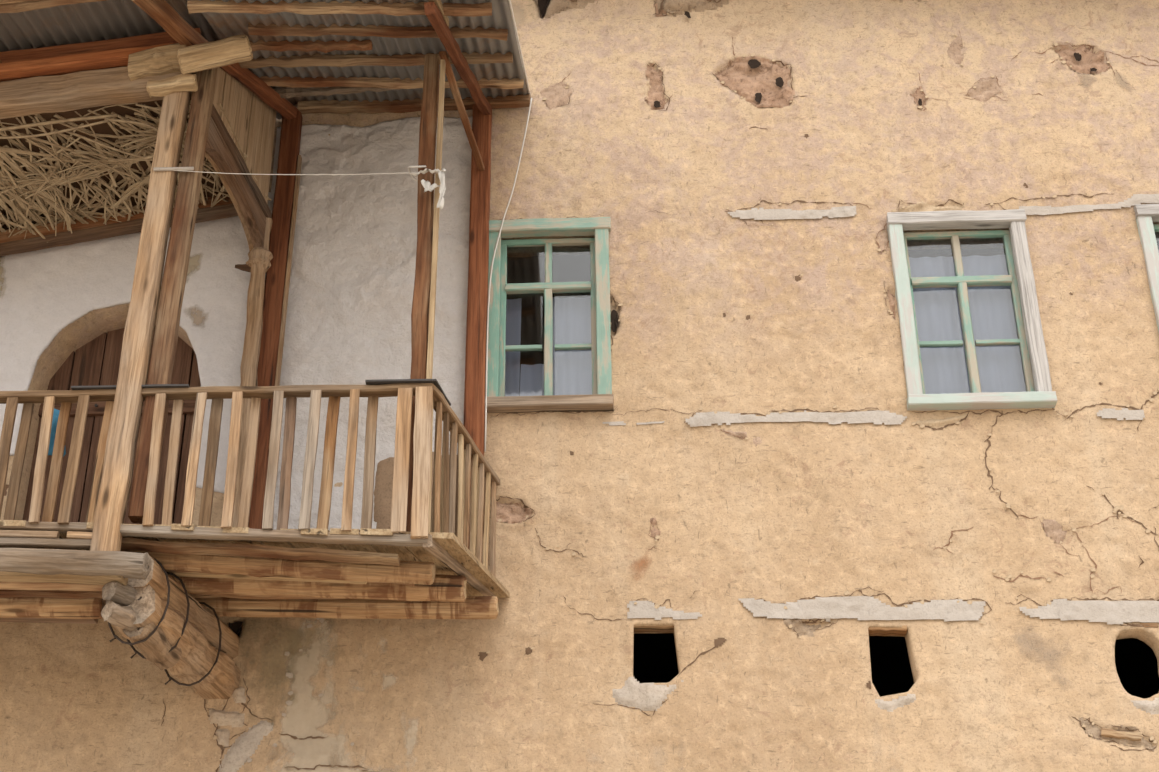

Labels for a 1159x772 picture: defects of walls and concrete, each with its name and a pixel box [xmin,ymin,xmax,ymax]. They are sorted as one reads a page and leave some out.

flaking render [534,0,594,19]
flaking render [653,0,729,18]
flaking render [644,59,672,111]
flaking render [712,37,803,108]
flaking render [1036,41,1159,84]
crack [493,388,1159,517]
crack [935,527,973,553]
crack [1087,486,1159,566]
crack [756,532,1154,627]
crack [564,591,695,621]
crack [592,646,716,716]
flaking render [1073,717,1157,751]